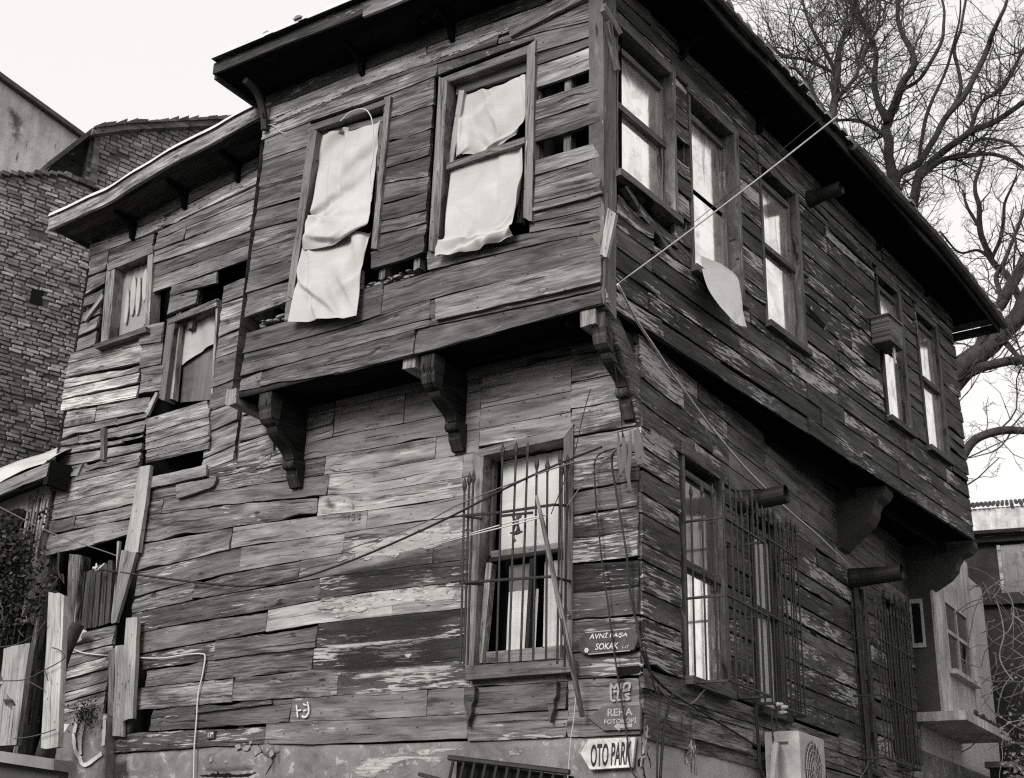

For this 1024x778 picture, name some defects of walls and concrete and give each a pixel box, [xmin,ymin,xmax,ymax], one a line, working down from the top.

peeling [642,429,677,457]
peeling [316,583,465,618]
spalling [617,664,644,678]